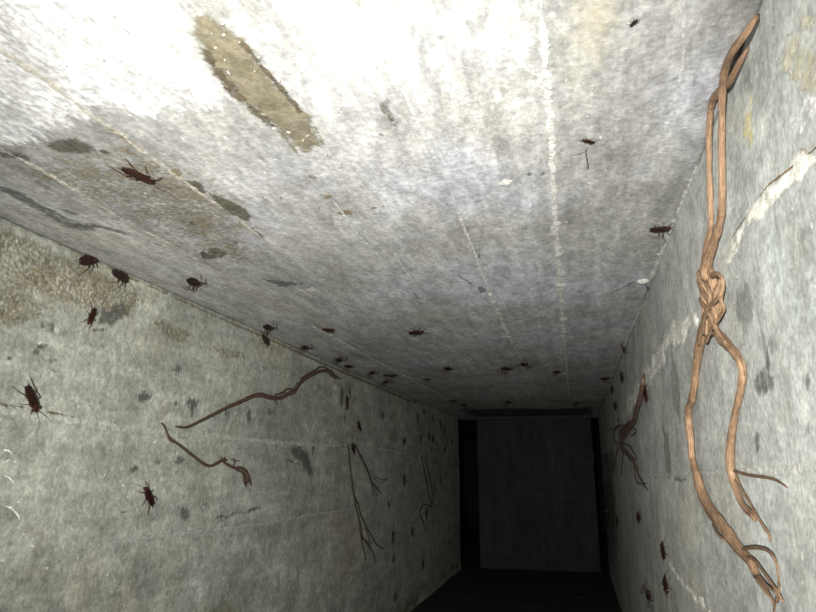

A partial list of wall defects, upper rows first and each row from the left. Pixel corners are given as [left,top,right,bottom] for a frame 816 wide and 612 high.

damp [0,0,323,261]
crack [732,146,816,238]